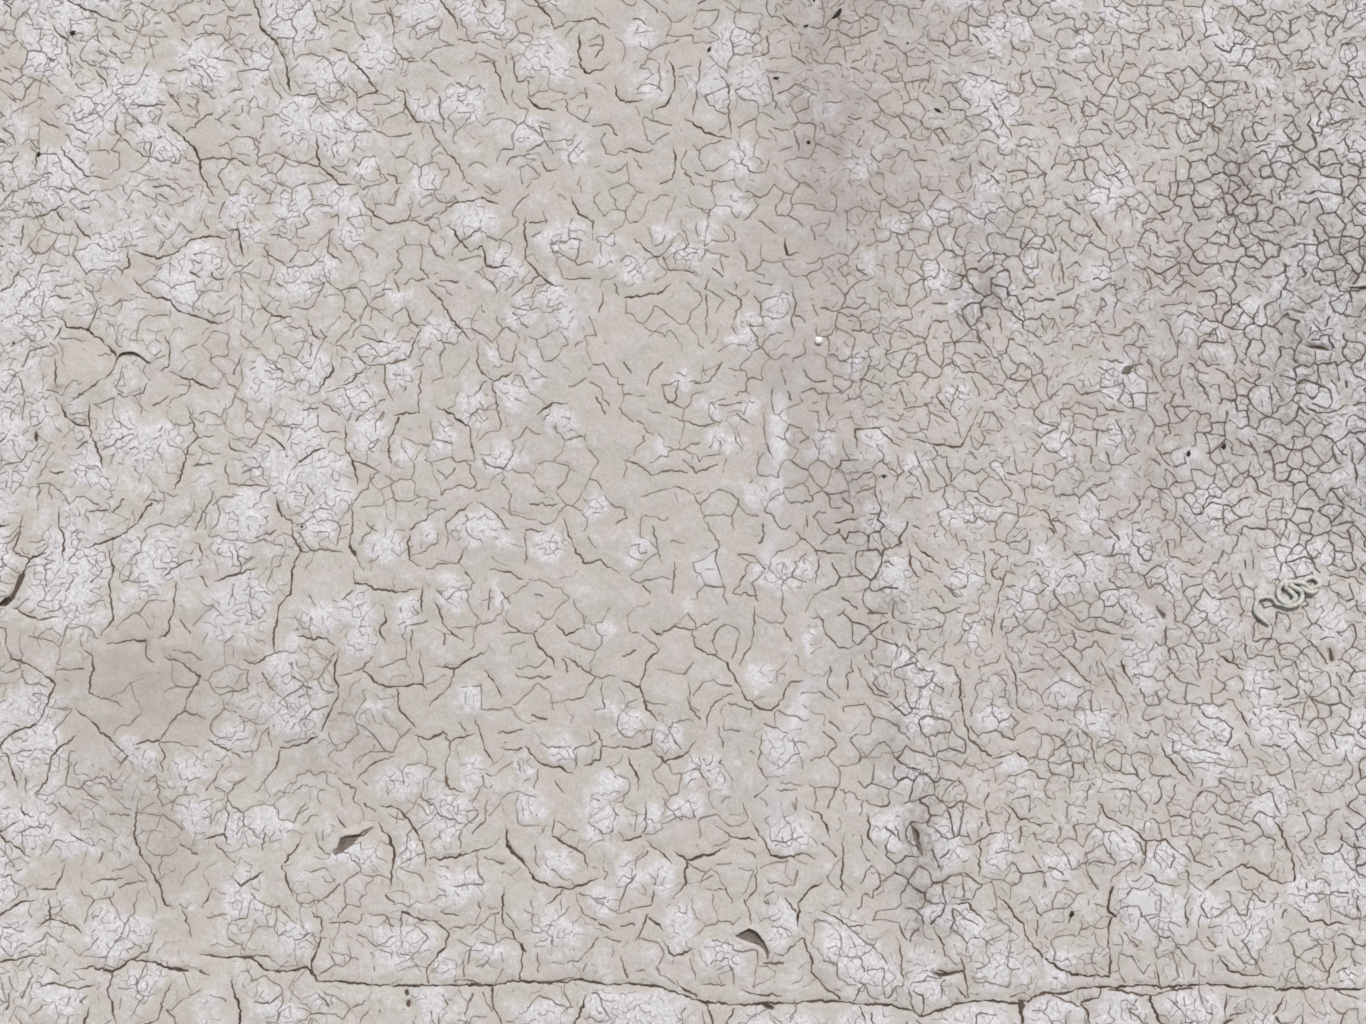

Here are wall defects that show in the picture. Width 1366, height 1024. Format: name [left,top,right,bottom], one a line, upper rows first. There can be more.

crack [406,0,617,136]
crack [600,133,643,169]
crack [550,163,676,280]
crack [568,377,610,414]
crack [575,275,806,478]
crack [193,446,221,466]
crack [108,639,153,662]
crack [332,571,430,676]
crack [627,514,676,593]
crack [641,486,765,604]
crack [732,515,846,666]
crack [795,655,841,701]